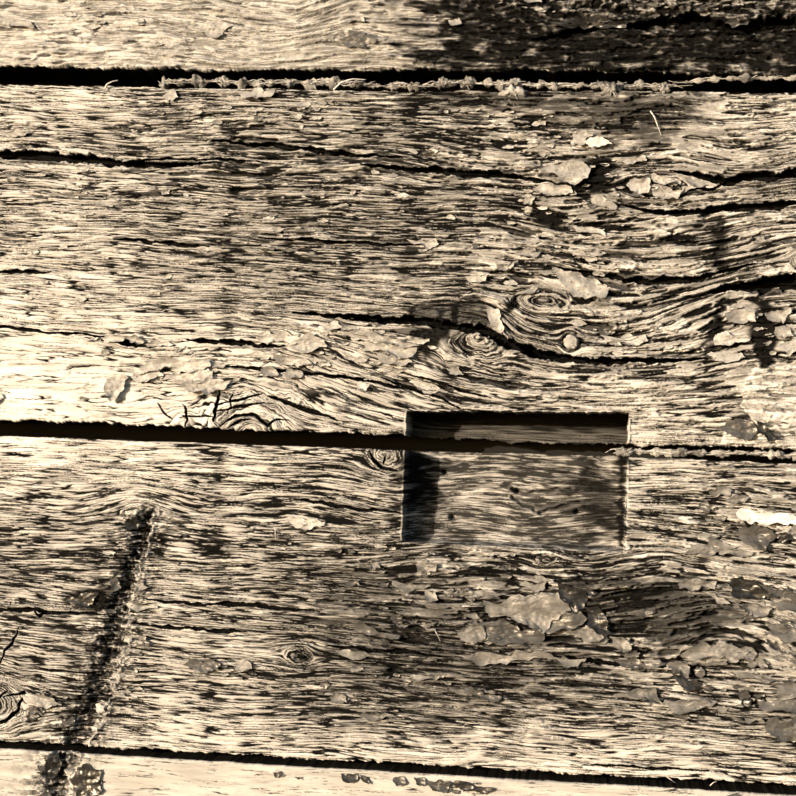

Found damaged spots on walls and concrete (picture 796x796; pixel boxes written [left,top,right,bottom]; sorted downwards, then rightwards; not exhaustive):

crack [0,139,556,184]
peeling [465,118,707,299]
peeling [81,334,242,402]
crack [0,325,491,409]
peeling [255,321,437,378]
crack [292,311,705,367]
peeling [707,300,796,363]
crack [157,390,338,428]
crack [0,607,107,664]
peeling [328,528,796,743]
crack [0,690,26,724]
peeling [393,776,495,794]